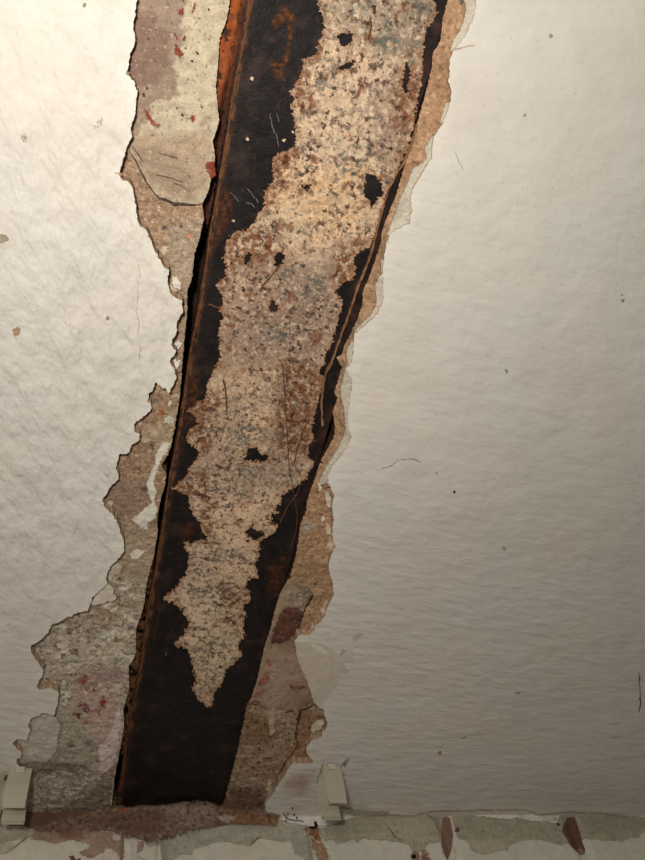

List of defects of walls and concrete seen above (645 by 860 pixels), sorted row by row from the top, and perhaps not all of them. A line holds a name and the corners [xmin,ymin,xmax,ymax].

crack [114,147,195,205]
rust [119,0,251,793]
spalling [0,0,477,860]
rust [271,8,294,74]
rust [320,123,418,426]
peeling [318,806,645,860]